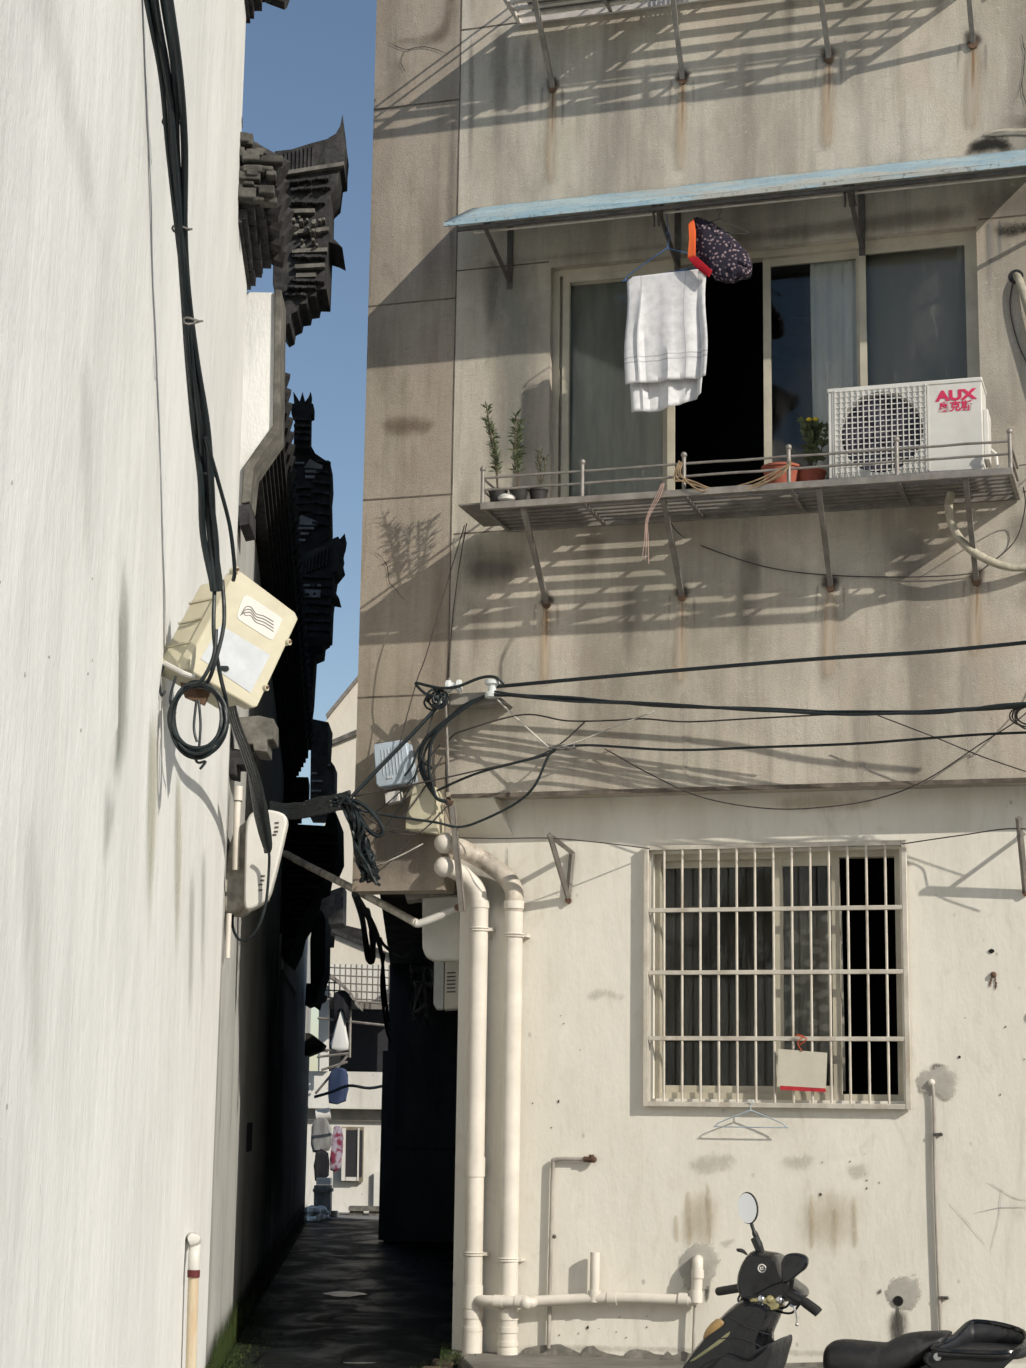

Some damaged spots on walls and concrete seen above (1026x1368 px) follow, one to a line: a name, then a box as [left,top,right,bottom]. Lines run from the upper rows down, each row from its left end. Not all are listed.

crack [388,42,447,71]
corrosion [547,78,558,181]
corrosion [677,70,689,168]
corrosion [822,49,836,145]
corrosion [966,32,981,126]